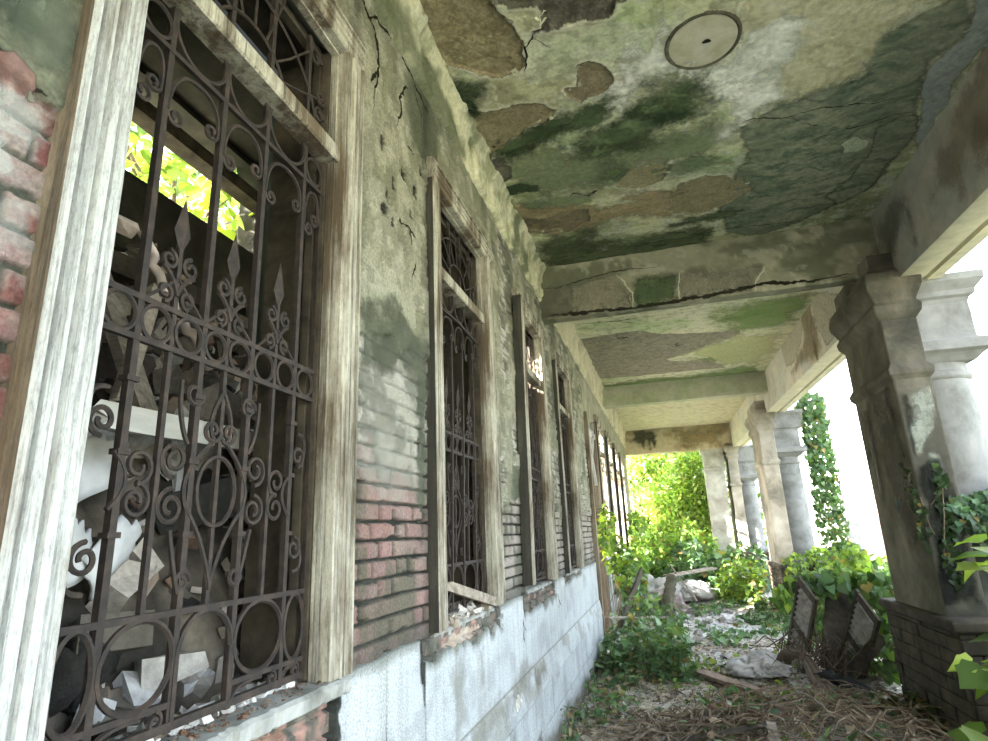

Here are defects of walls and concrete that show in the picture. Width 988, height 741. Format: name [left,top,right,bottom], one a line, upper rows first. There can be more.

spalling [0,50,40,103]
crack [362,0,428,155]
water stain [453,78,487,117]
peeling [420,0,525,78]
peeling [469,103,561,160]
peeling [564,61,614,103]
water stain [491,0,975,266]
crack [732,95,915,142]
peeling [915,0,988,147]
crack [542,210,852,324]
water stain [904,387,982,605]
spalling [250,703,329,741]